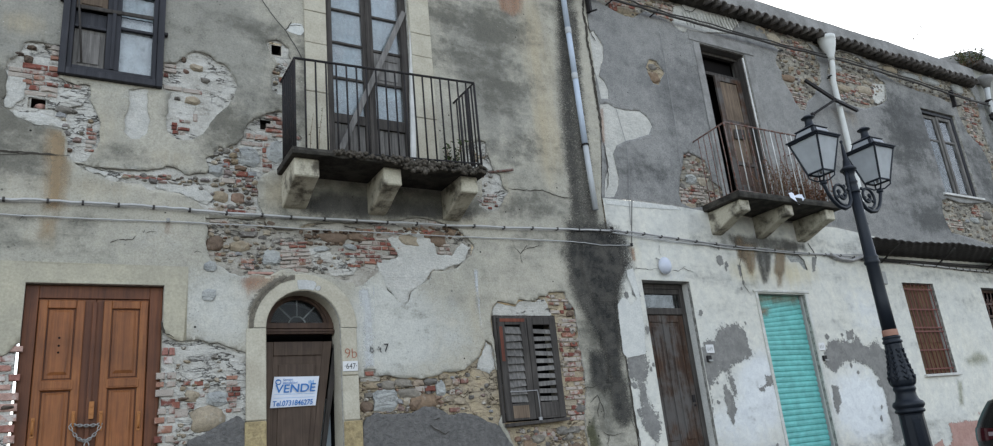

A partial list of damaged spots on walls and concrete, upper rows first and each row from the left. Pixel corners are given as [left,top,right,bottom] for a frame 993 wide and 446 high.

spalling [2,40,473,306]
water stain [557,0,634,427]
peeling [589,31,723,210]
spalling [755,26,993,179]
spalling [942,199,993,245]
spalling [0,344,23,446]
spalling [153,332,249,446]
spalling [359,292,588,446]
water stain [587,421,601,446]
peeling [618,269,662,445]
peeling [701,322,753,424]
peeling [824,329,904,444]